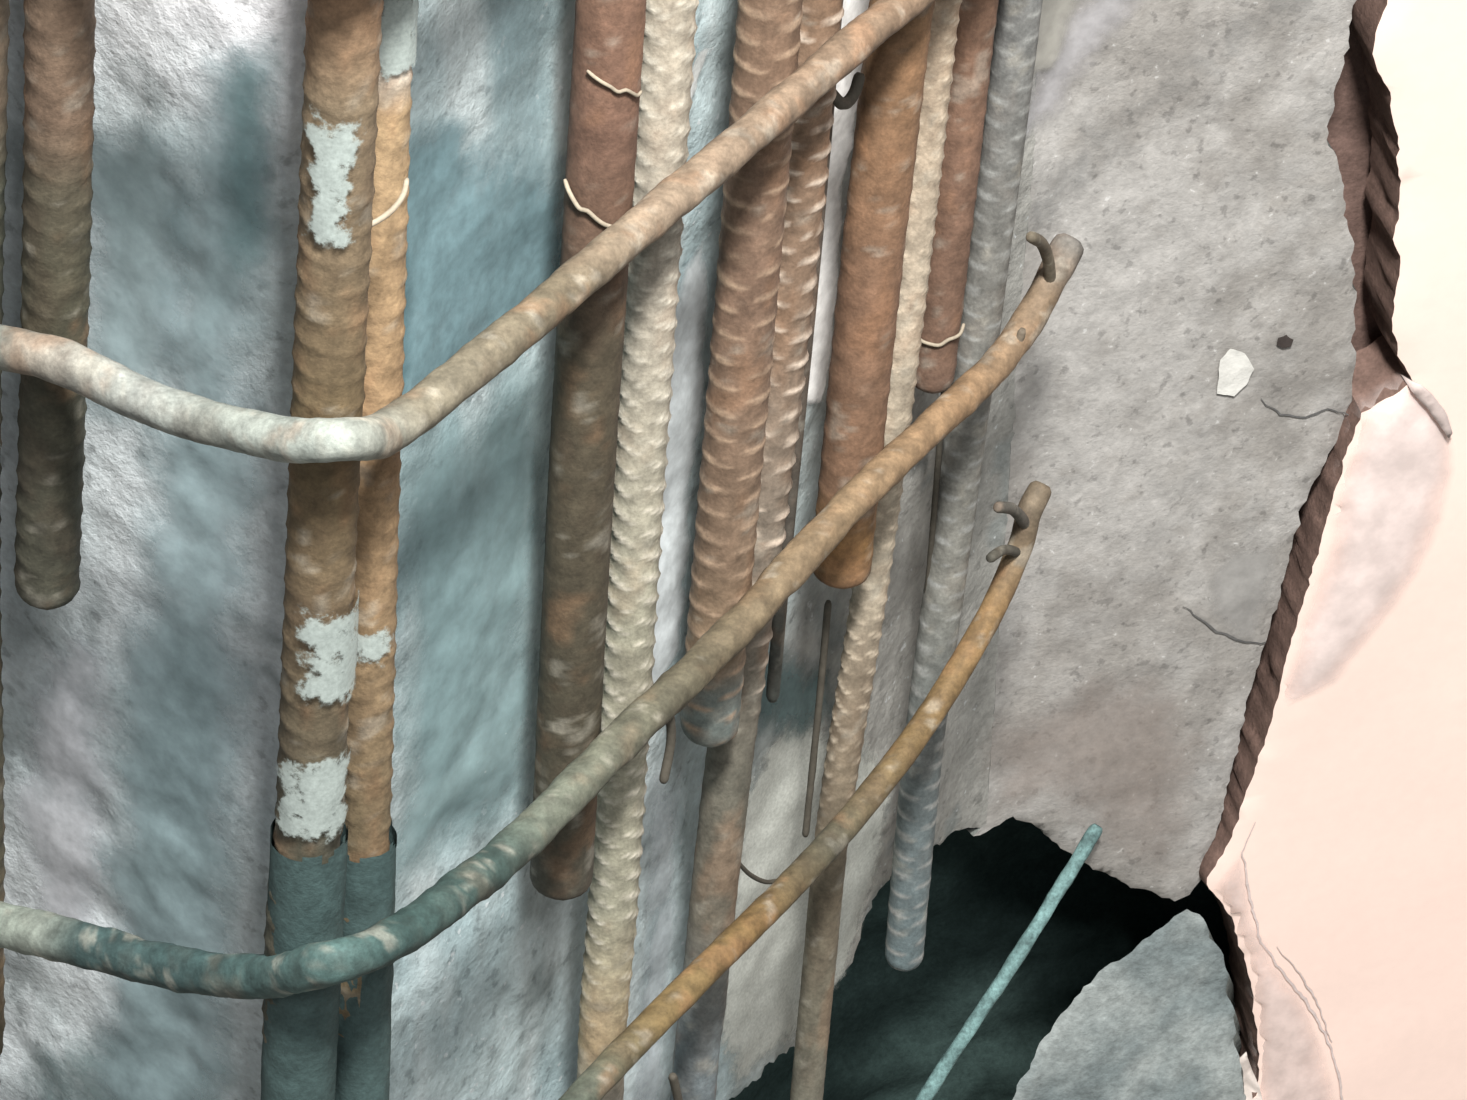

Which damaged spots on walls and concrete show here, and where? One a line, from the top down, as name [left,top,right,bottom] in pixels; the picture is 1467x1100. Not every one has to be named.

spalling [0,370,87,902]
spalling [0,0,97,348]
spalling [261,964,394,1100]
spalling [263,451,402,957]
spalling [290,0,419,418]
spalling [530,743,650,1078]
spalling [533,218,684,801]
spalling [560,0,699,266]
spalling [680,598,788,970]
spalling [813,477,904,838]
spalling [685,0,1043,653]
spalling [670,713,1167,1100]